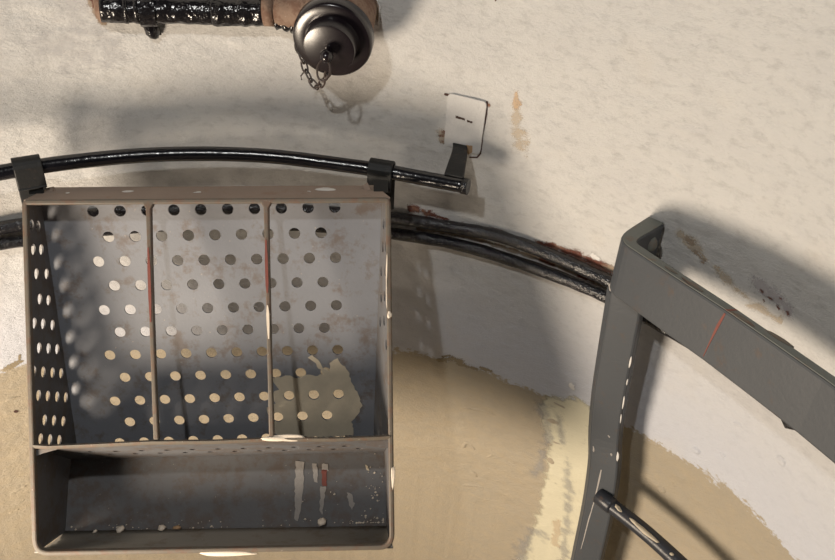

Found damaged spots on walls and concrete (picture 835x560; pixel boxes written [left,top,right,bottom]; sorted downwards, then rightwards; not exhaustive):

corrosion [533,240,614,274]